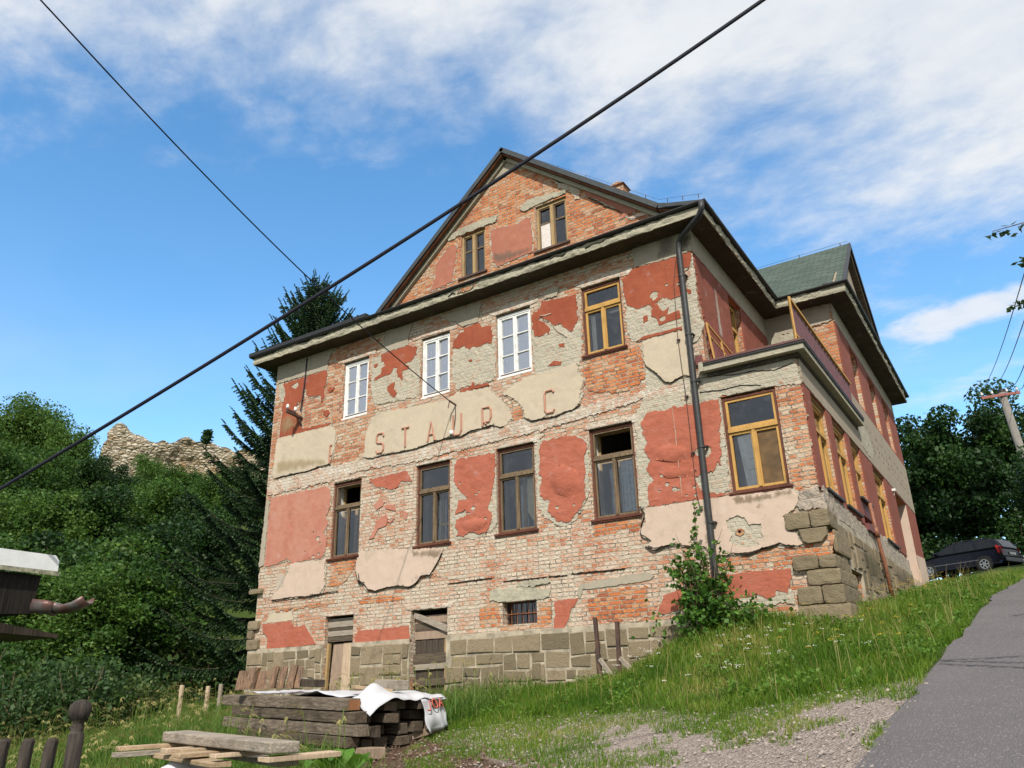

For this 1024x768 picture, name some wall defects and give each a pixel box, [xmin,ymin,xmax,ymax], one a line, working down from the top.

spalling [400,168,652,304]
spalling [257,252,911,646]